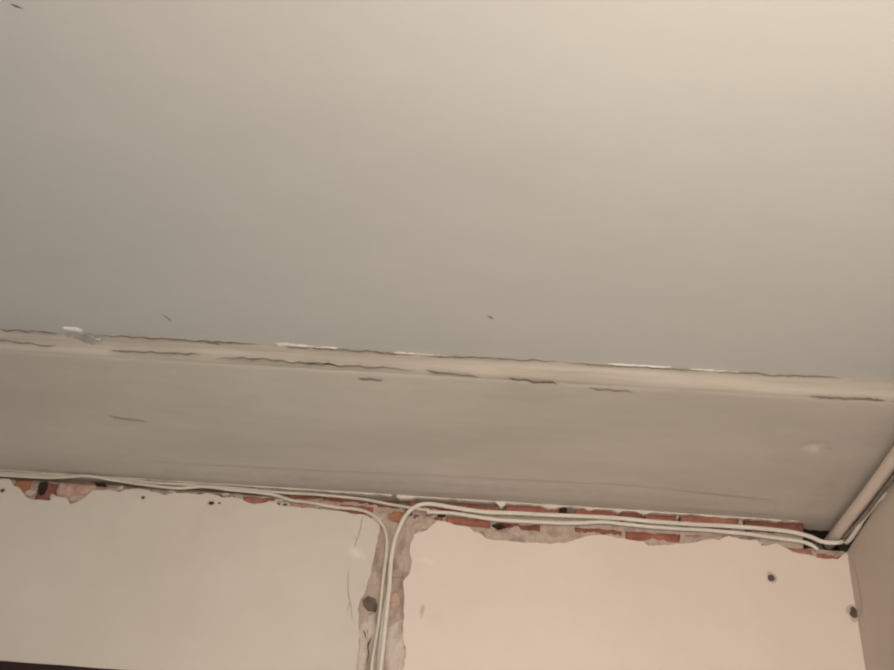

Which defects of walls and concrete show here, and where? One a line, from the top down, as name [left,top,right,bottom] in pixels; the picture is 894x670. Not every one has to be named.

spalling [0,469,894,559]
spalling [363,596,377,612]